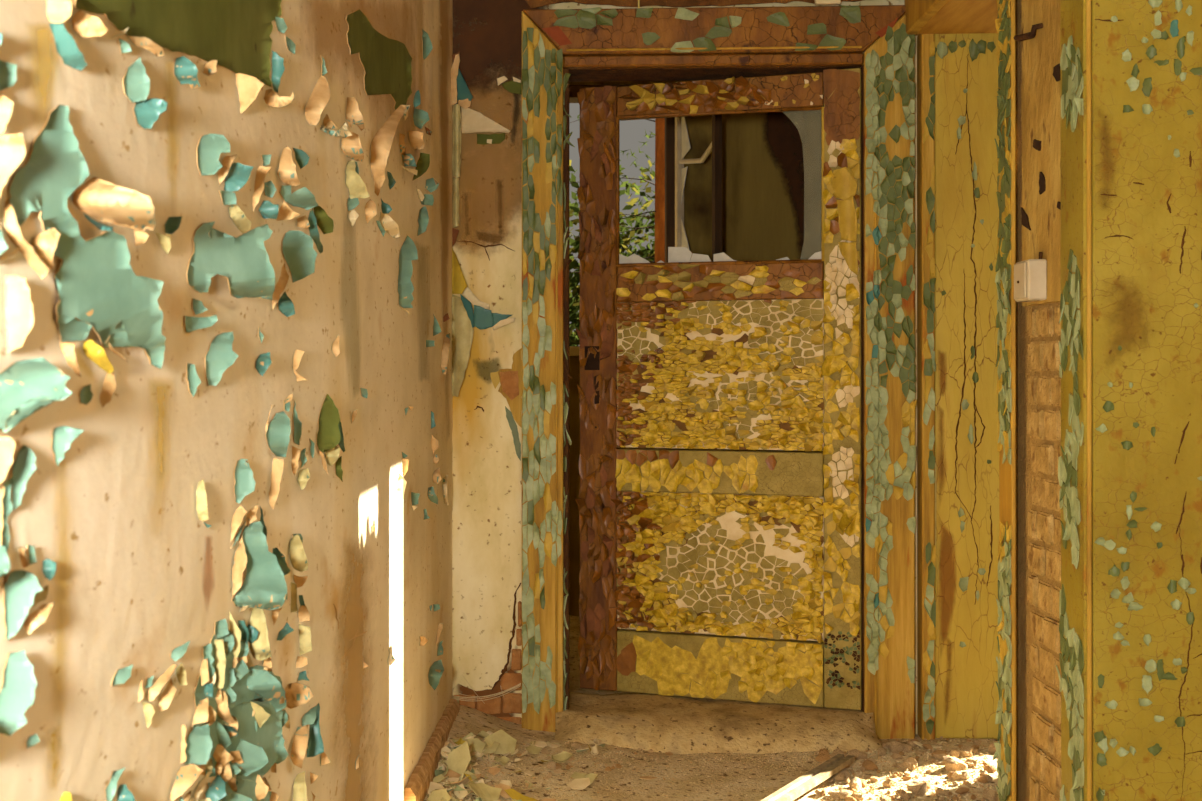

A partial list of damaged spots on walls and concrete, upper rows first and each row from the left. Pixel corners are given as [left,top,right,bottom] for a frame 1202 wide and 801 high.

peeling [1052,35,1084,132]
peeling [1122,0,1202,114]
crack [1101,182,1202,274]
crack [955,55,993,603]
peeling [0,60,182,748]
peeling [46,0,1031,781]
crack [1174,422,1189,464]
spalling [1027,249,1188,801]
crack [491,583,521,690]
peeling [1167,577,1196,625]
crack [1176,493,1202,797]
peeling [105,767,135,801]